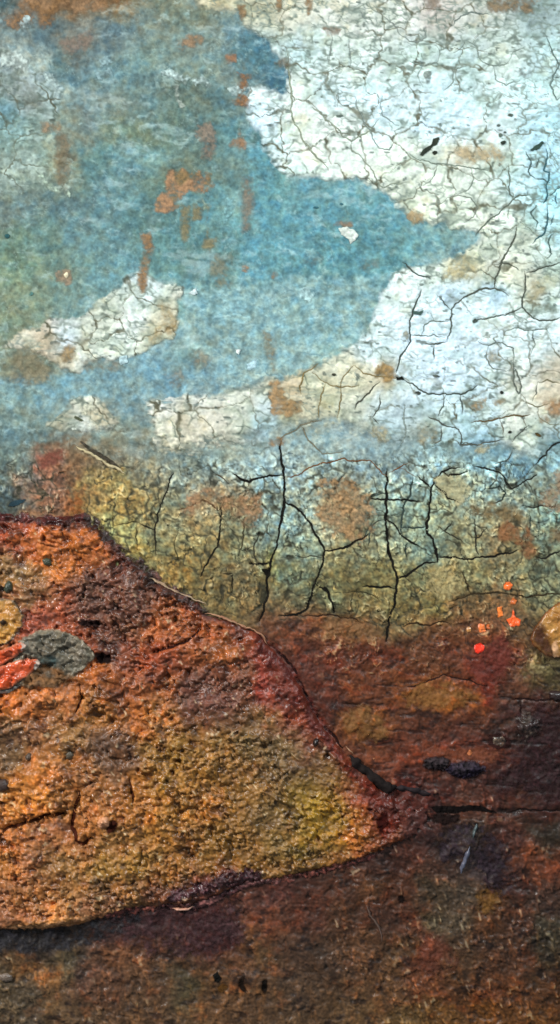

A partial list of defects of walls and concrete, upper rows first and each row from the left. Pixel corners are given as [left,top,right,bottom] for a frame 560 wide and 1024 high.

crack [360,11,519,89]
crack [546,36,559,100]
corrosion [182,207,208,240]
corrosion [138,234,152,291]
peeling [62,345,74,361]
crack [112,68,560,642]